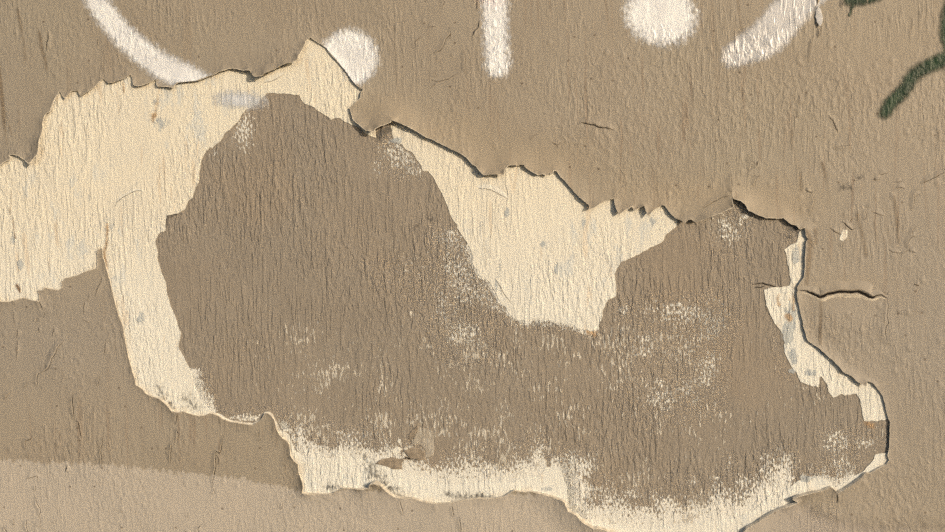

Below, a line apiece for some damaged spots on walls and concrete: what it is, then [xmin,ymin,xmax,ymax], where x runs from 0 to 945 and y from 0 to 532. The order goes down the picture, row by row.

crack [874,168,945,254]
crack [752,278,919,363]
crack [2,310,64,400]
peeling [803,323,878,389]
peeling [131,366,179,413]
crack [61,393,103,472]
crack [165,413,178,464]
crack [209,435,224,494]
spalling [375,457,412,469]
spalling [403,447,426,461]
spalling [409,425,434,458]
peeling [369,481,612,532]